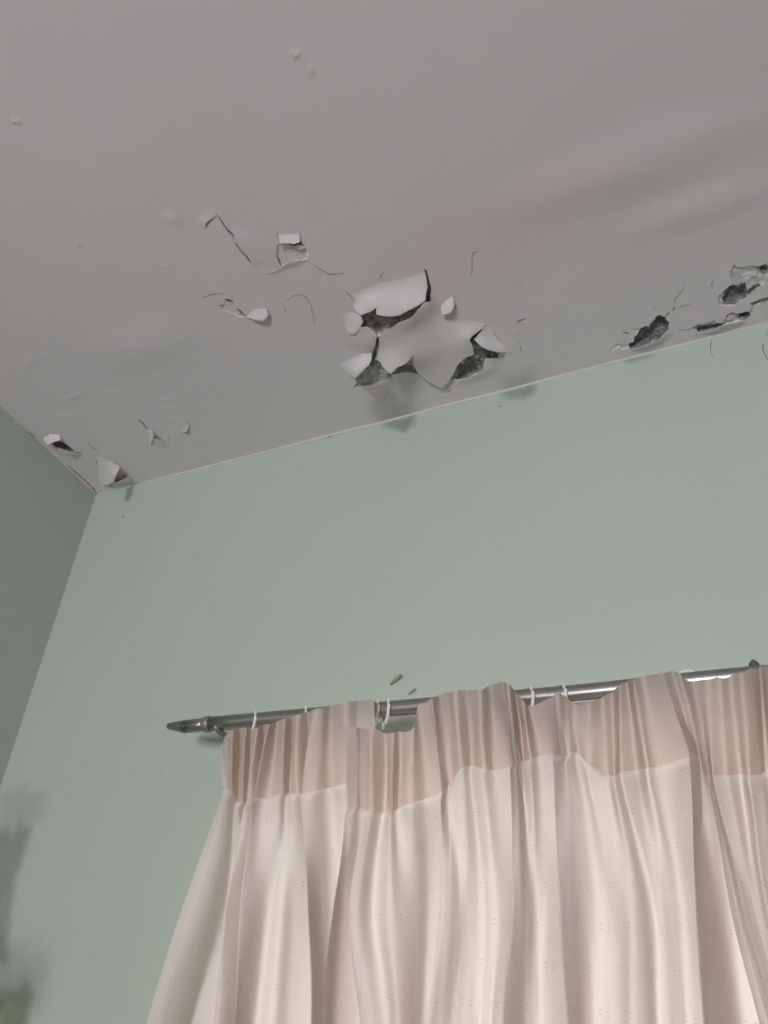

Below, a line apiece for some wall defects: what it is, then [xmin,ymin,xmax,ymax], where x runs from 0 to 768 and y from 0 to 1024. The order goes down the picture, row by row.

peeling [268,234,344,275]
peeling [204,293,269,321]
spalling [609,264,768,352]
peeling [340,269,510,406]
peeling [44,434,133,488]